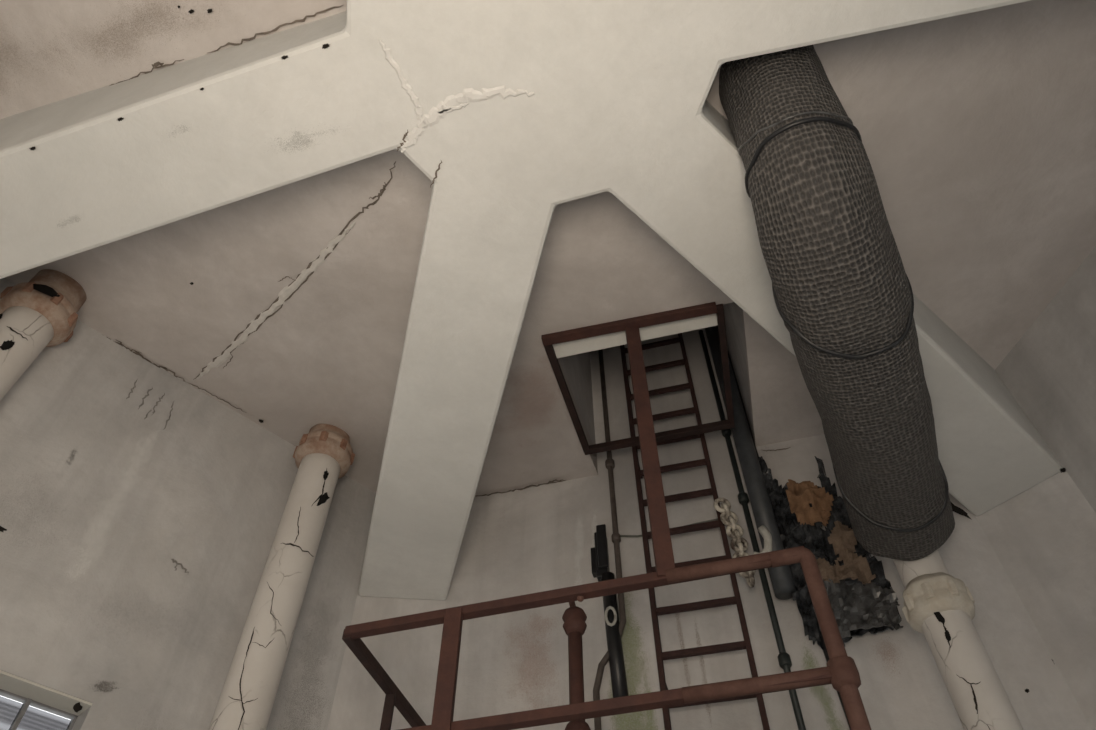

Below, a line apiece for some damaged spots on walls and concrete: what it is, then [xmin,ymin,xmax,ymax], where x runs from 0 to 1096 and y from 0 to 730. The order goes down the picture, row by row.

crack [109,5,343,86]
crack [281,468,327,557]
crack [171,559,189,573]
crack [228,582,279,730]
water stain [609,710,659,730]
crack [956,674,990,729]